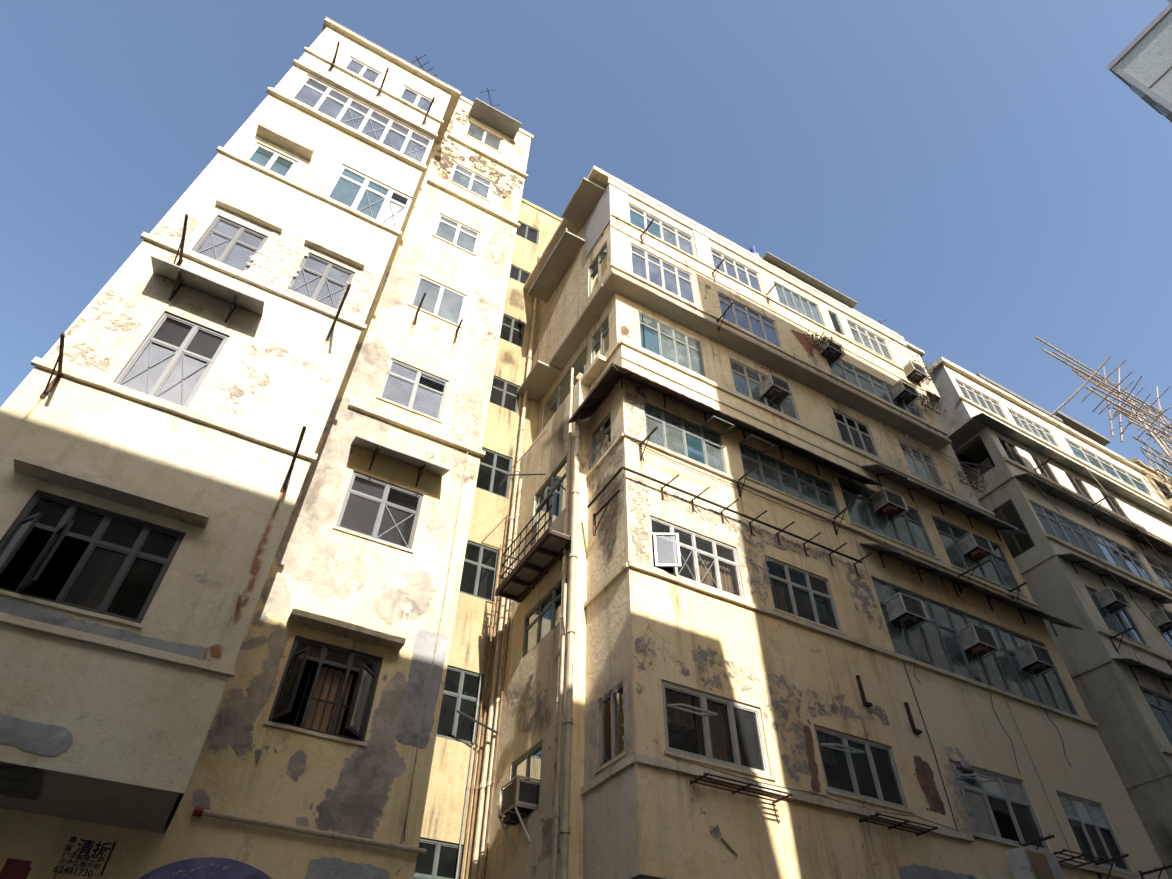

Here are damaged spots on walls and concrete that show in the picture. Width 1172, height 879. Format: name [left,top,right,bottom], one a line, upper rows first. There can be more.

spalling [433,106,524,199]
peeling [49,289,140,370]
peeling [340,256,419,322]
peeling [468,290,500,347]
peeling [482,221,514,283]
peeling [588,378,828,607]
rust [234,486,287,622]
peeling [206,338,392,766]
peeling [372,569,437,634]
peeling [845,561,883,630]
peeling [676,645,890,793]
peeling [280,746,314,782]